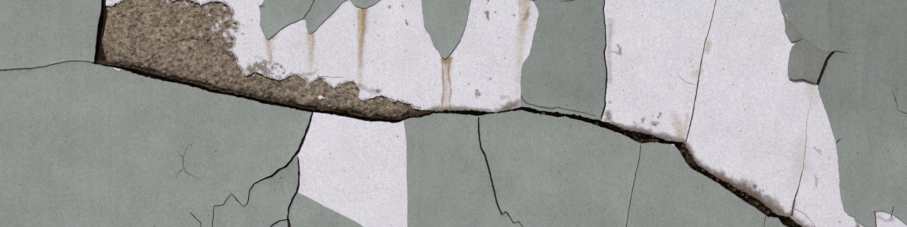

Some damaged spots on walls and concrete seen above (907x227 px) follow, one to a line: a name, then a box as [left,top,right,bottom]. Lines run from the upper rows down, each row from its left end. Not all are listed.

crack [0,60,78,71]
peeling [95,0,539,227]
crack [81,0,806,227]
peeling [597,0,865,227]
crack [816,50,845,85]
peeling [876,211,907,227]